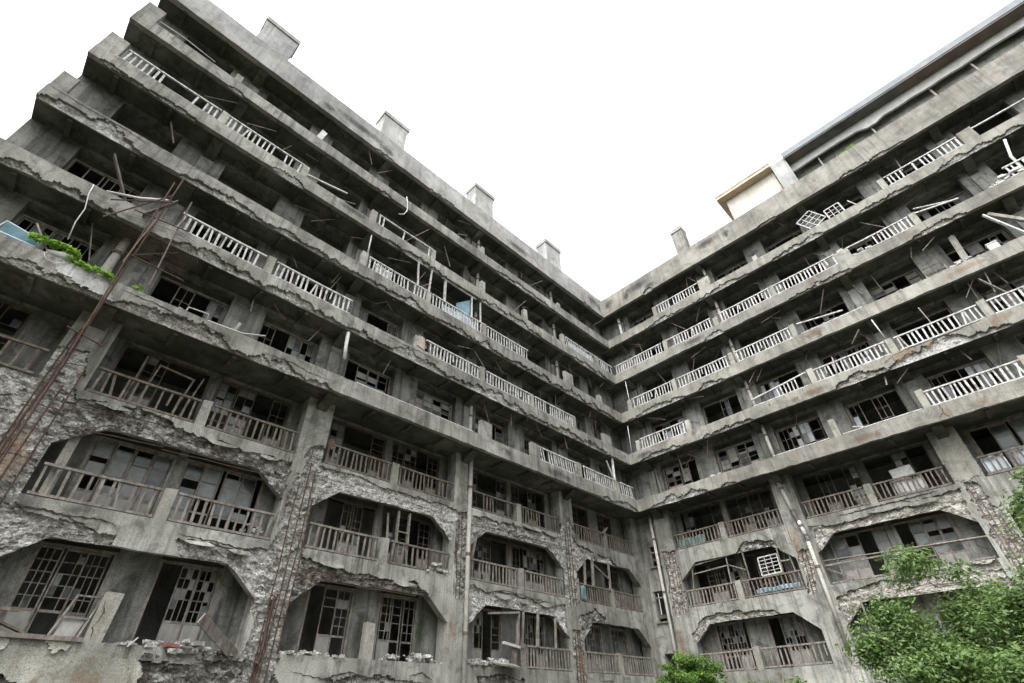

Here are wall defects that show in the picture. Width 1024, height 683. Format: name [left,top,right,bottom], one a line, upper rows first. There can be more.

crack [883,318,984,364]
spalling [0,329,616,683]
spalling [798,440,1024,621]
spalling [662,551,687,617]
spalling [692,610,780,643]